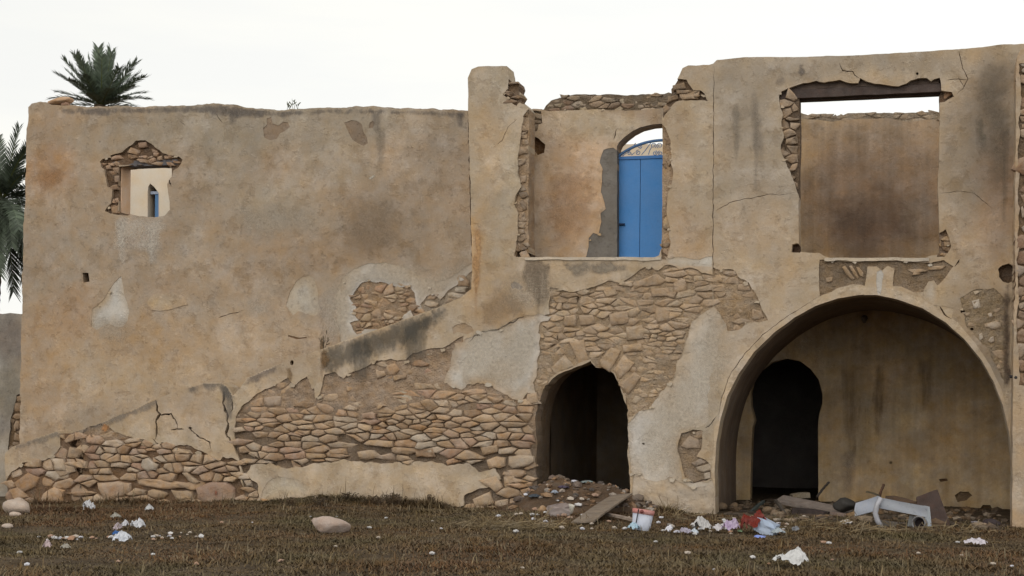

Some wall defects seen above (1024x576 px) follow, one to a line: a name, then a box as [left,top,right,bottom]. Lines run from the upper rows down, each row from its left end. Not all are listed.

spalling [0,80,768,514]
crack [712,76,784,265]
spalling [779,88,953,200]
spalling [819,230,953,296]
spalling [960,63,1024,385]